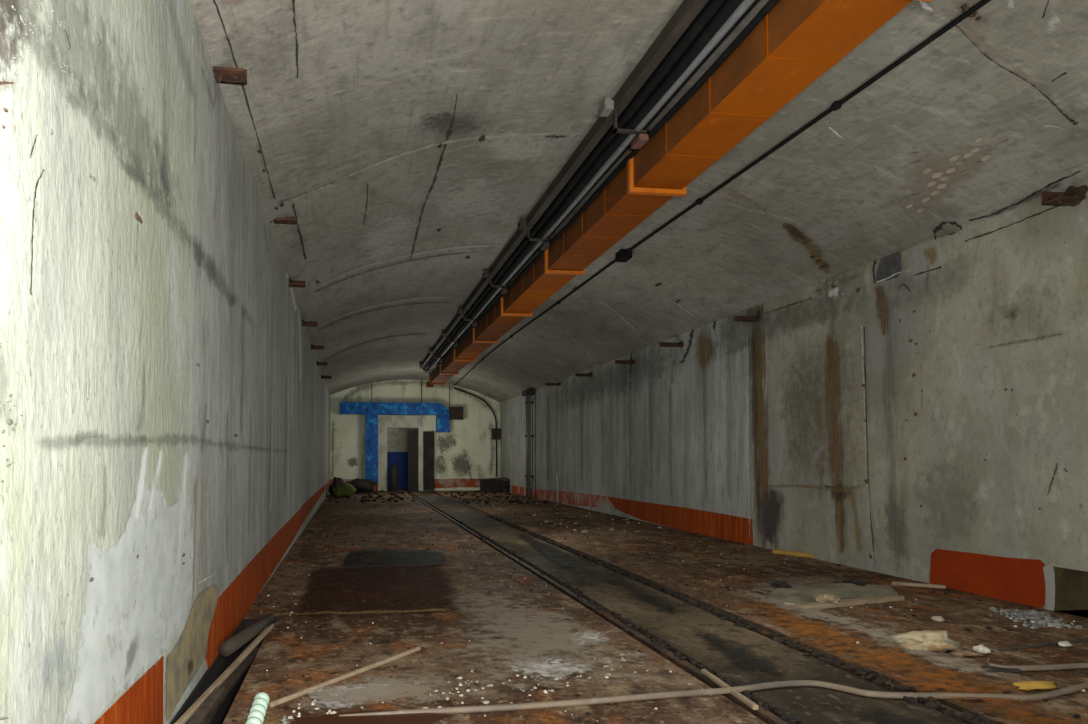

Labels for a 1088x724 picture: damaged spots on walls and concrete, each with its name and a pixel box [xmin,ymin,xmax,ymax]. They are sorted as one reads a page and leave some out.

water stain [0,0,71,81]
crack [951,20,1079,125]
crack [30,135,44,295]
crack [410,94,458,259]
corrosion [783,224,830,273]
spalling [872,251,911,292]
corrosion [747,307,861,552]
spalling [166,576,220,720]